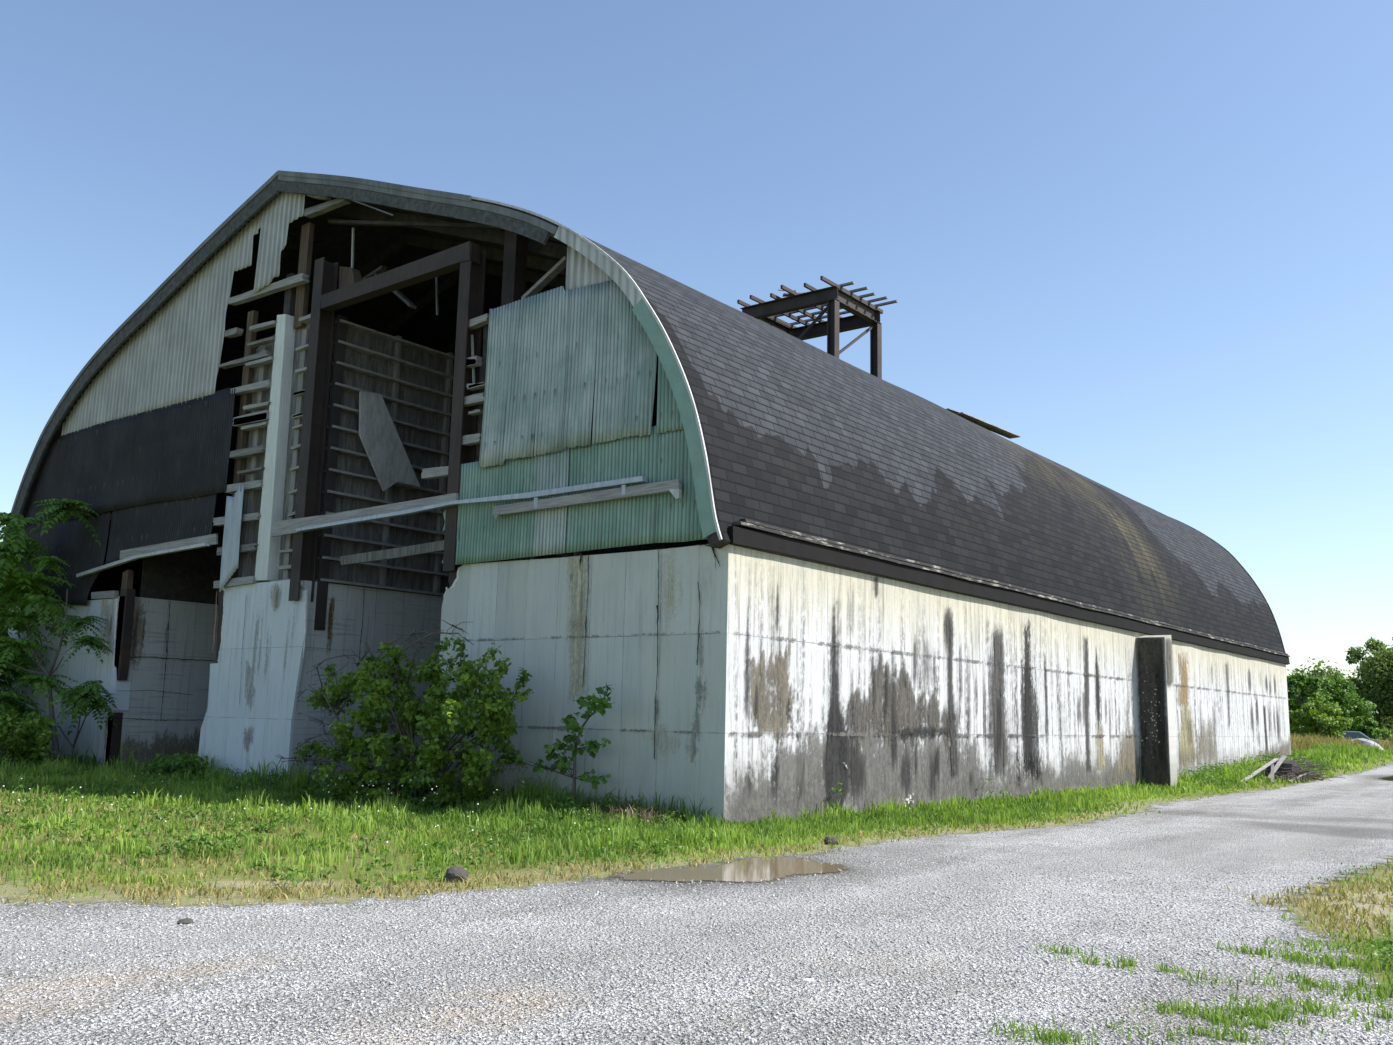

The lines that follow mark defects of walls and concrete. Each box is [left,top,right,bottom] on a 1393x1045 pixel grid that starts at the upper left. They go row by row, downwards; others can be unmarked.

rust [243,727,254,751]
water stain [621,591,1291,823]